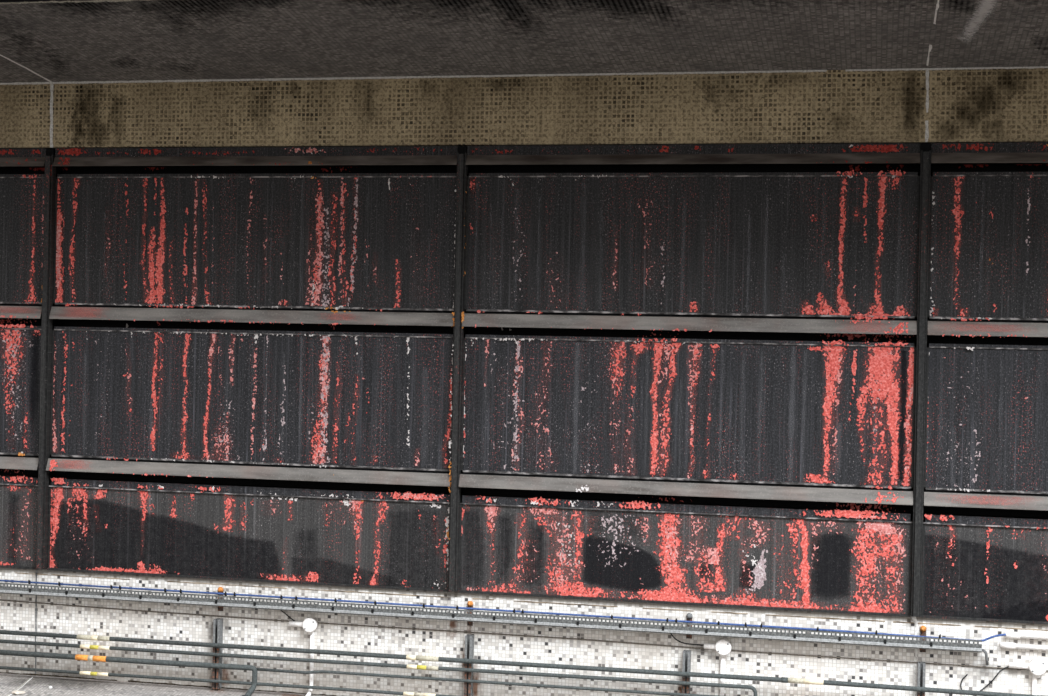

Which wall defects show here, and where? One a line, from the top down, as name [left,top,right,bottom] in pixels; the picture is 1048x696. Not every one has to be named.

peeling [1015,144,1048,247]
peeling [942,164,1027,338]
peeling [0,148,286,463]
peeling [49,331,179,574]
peeling [187,475,254,532]
peeling [260,558,318,582]
peeling [325,491,465,589]
peeling [467,144,914,613]
peeling [924,514,968,607]
peeling [943,363,983,487]
peeling [975,526,1023,609]